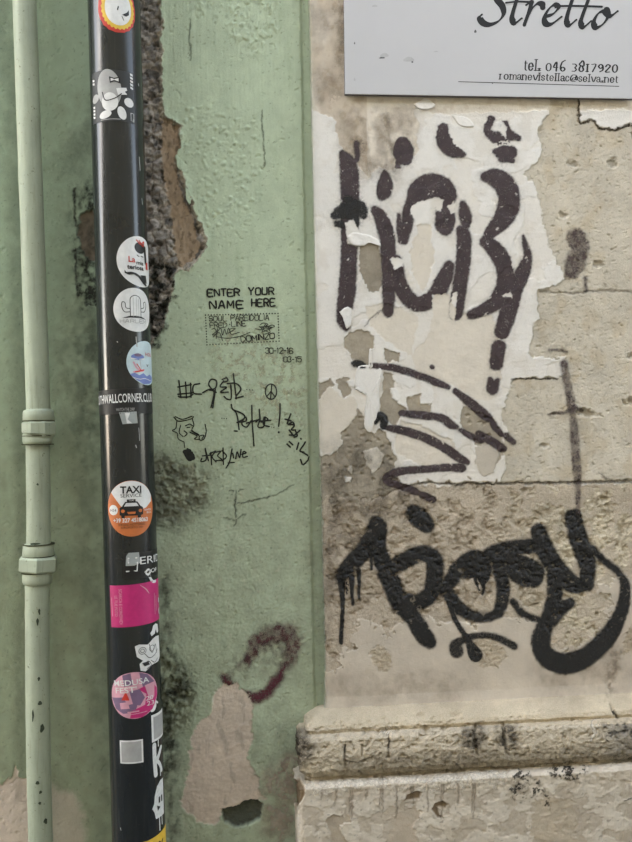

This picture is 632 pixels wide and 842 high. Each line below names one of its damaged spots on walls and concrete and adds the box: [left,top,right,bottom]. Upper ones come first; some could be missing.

spalling [140,0,208,349]
flaking render [309,0,632,674]
peeling [160,648,267,826]
flaking render [0,767,42,842]
flaking render [43,775,92,842]
spalling [296,779,306,804]
spalling [326,814,351,842]
flaking render [527,796,580,842]